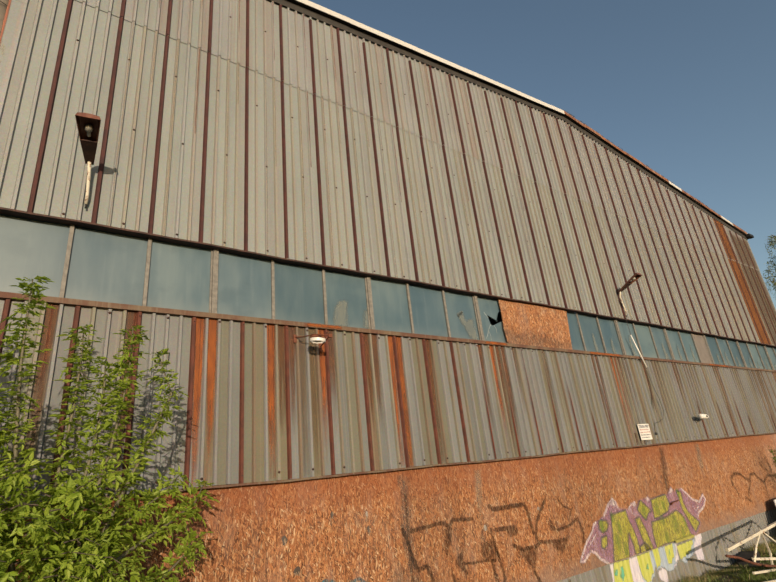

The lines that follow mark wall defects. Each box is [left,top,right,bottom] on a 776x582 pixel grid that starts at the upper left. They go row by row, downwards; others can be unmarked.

corrosion [687,211,776,345]
corrosion [192,318,217,468]
corrosion [267,323,341,451]
corrosion [363,334,380,411]
corrosion [388,336,413,465]
corrosion [477,341,521,439]
corrosion [590,352,645,445]